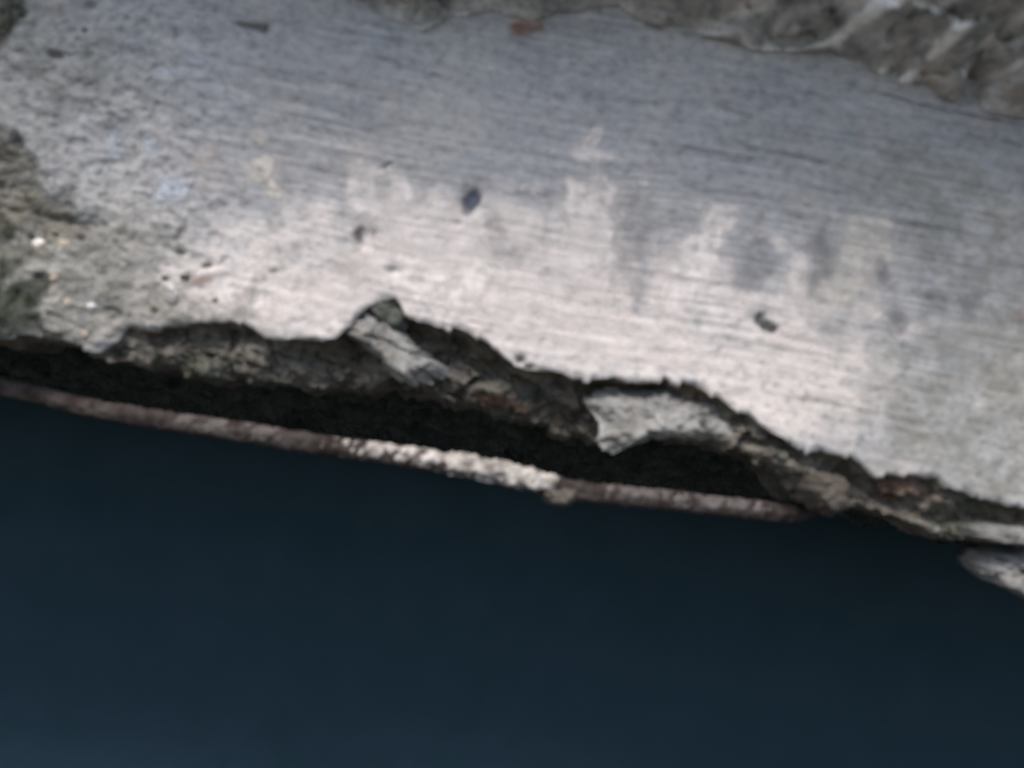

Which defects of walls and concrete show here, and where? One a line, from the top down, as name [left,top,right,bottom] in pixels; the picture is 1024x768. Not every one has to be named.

spalling [0,298,1024,546]